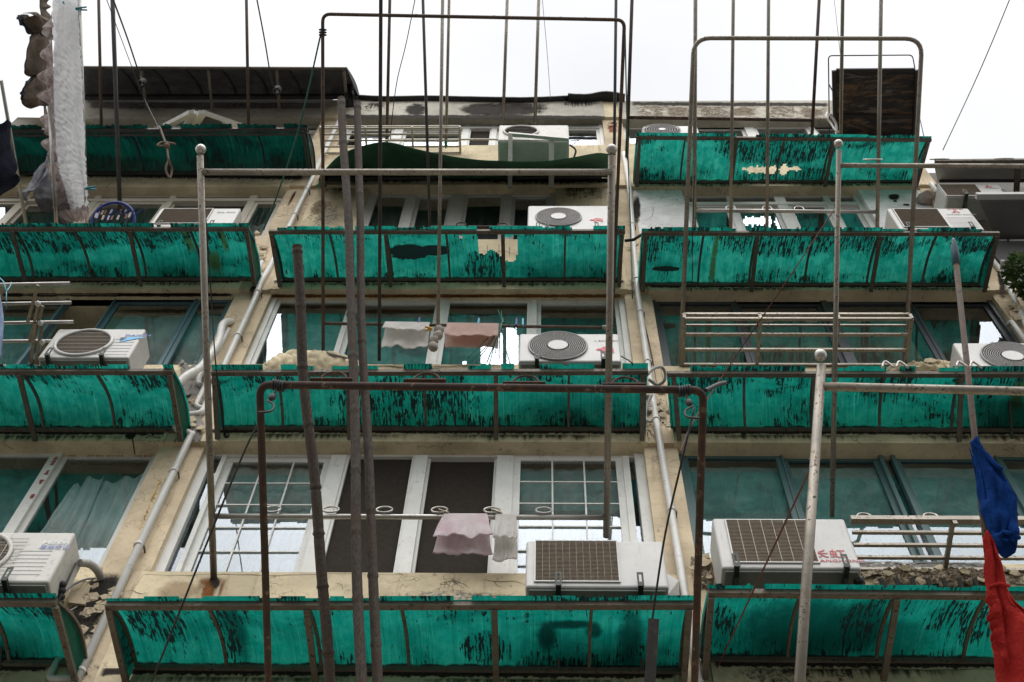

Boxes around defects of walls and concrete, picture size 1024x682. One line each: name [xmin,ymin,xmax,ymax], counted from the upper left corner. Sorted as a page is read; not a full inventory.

damp [346,102,600,119]
corrosion [201,578,224,598]
peeling [79,578,124,647]